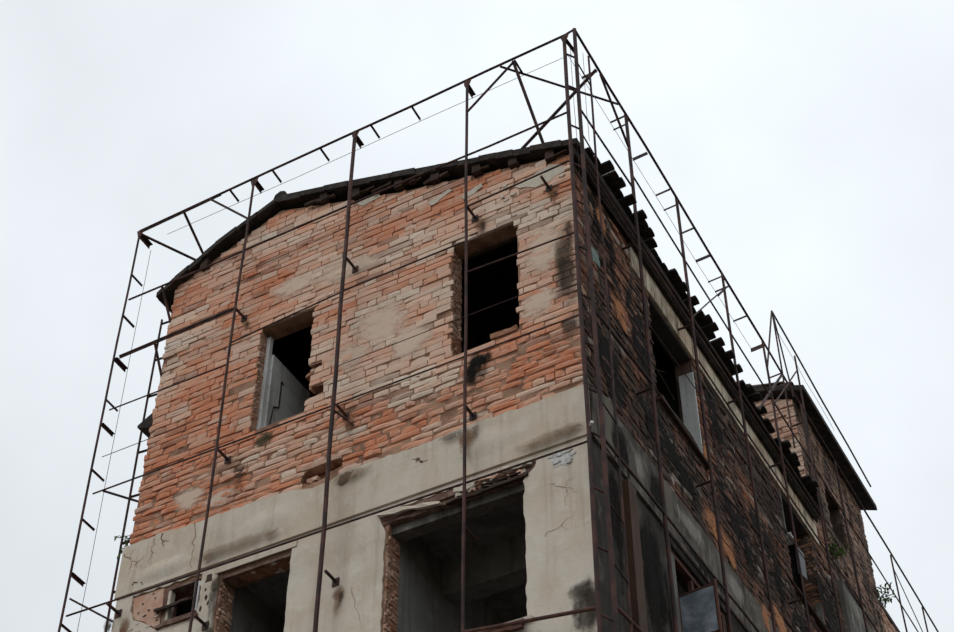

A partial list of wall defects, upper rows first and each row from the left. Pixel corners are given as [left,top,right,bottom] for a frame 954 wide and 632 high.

damp [467,352,491,383]
damp [587,190,697,505]
crack [124,533,166,585]
peeling [128,588,165,632]
spalling [377,459,535,632]
peeling [548,448,576,468]
damp [608,424,630,590]
damp [641,474,673,632]
damp [714,465,809,632]